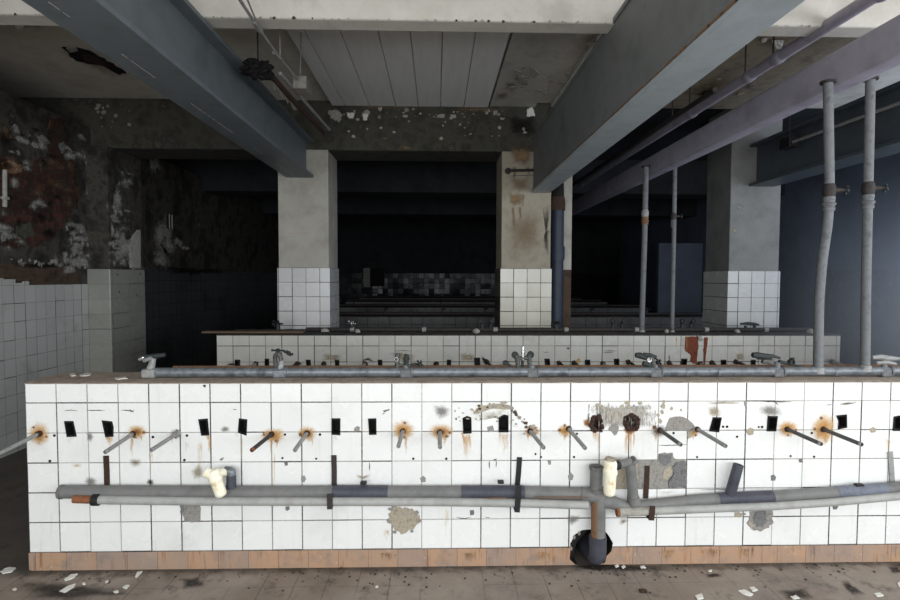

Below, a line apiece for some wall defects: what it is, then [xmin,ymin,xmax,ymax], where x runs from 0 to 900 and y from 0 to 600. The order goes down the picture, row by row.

spalling [61,46,126,75]
flaking render [0,117,80,285]
corrosion [676,335,708,365]
corrosion [32,426,47,442]
peeling [455,401,537,433]
corrosion [585,414,604,433]
corrosion [624,413,640,441]
peeling [588,400,695,439]
corrosion [814,417,832,439]
spalling [616,452,687,489]
spalling [387,506,421,534]
spalling [734,510,774,532]